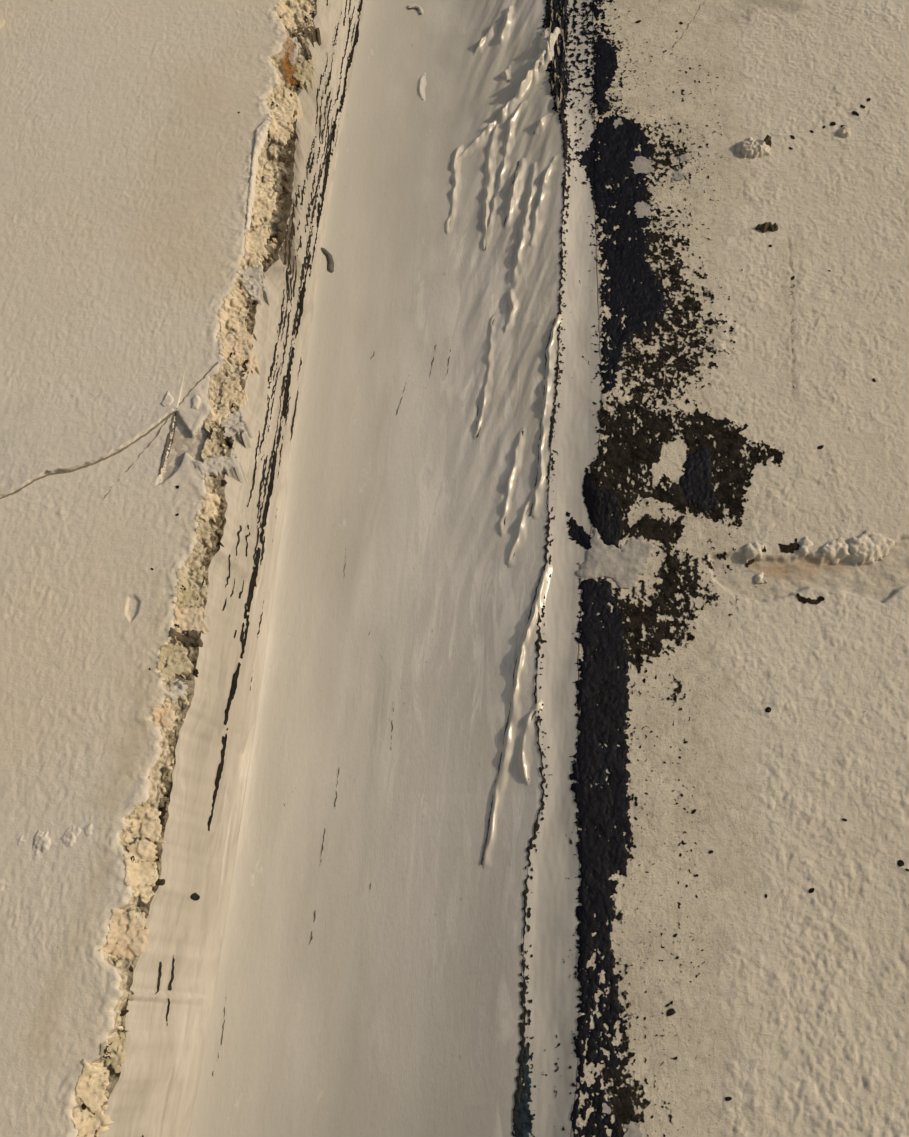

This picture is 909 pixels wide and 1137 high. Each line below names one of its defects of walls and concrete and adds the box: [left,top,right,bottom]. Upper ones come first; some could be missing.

crack [0,362,218,509]
spalling [71,0,321,1137]